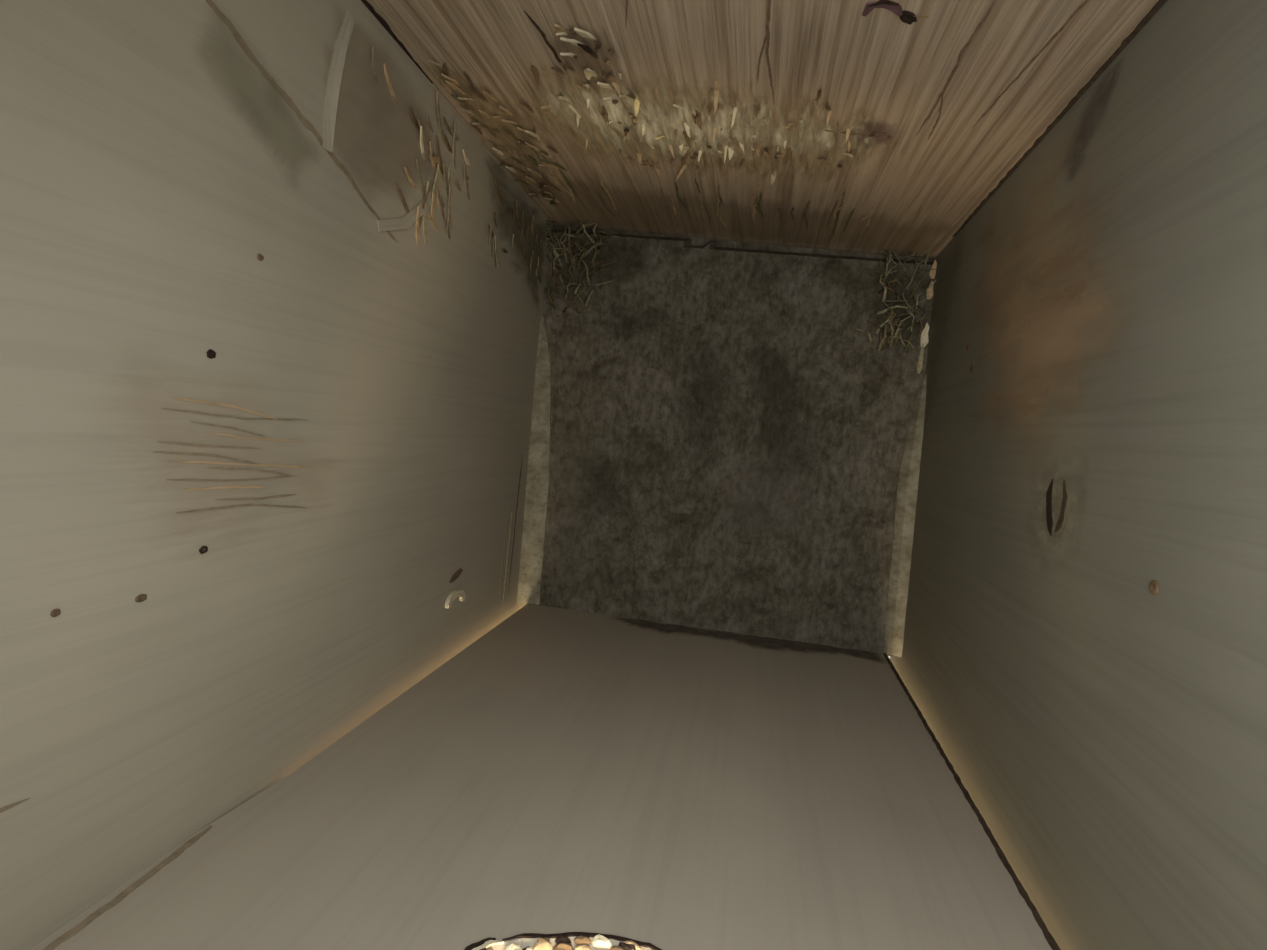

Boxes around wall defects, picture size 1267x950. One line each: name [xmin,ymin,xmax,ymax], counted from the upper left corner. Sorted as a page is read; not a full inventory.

spalling [862,0,928,25]
spalling [531,27,891,185]
crack [205,0,398,243]
crack [0,798,30,813]
spalling [464,932,662,950]